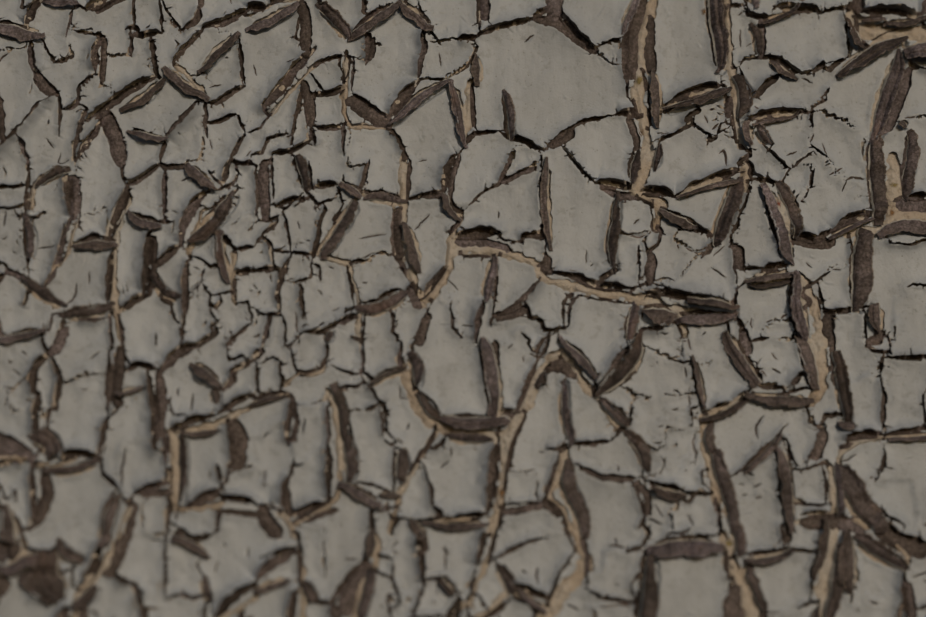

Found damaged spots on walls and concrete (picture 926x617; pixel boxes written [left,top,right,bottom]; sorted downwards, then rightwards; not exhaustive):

peeling [0,0,310,544]
peeling [0,126,659,617]
crack [0,0,728,617]
peeling [291,0,926,617]
crack [658,93,788,311]
crack [723,277,813,397]
crack [762,142,826,182]
crack [722,0,926,132]
crack [790,143,926,482]
crack [880,66,926,213]
crack [723,405,866,617]
crack [881,509,926,617]